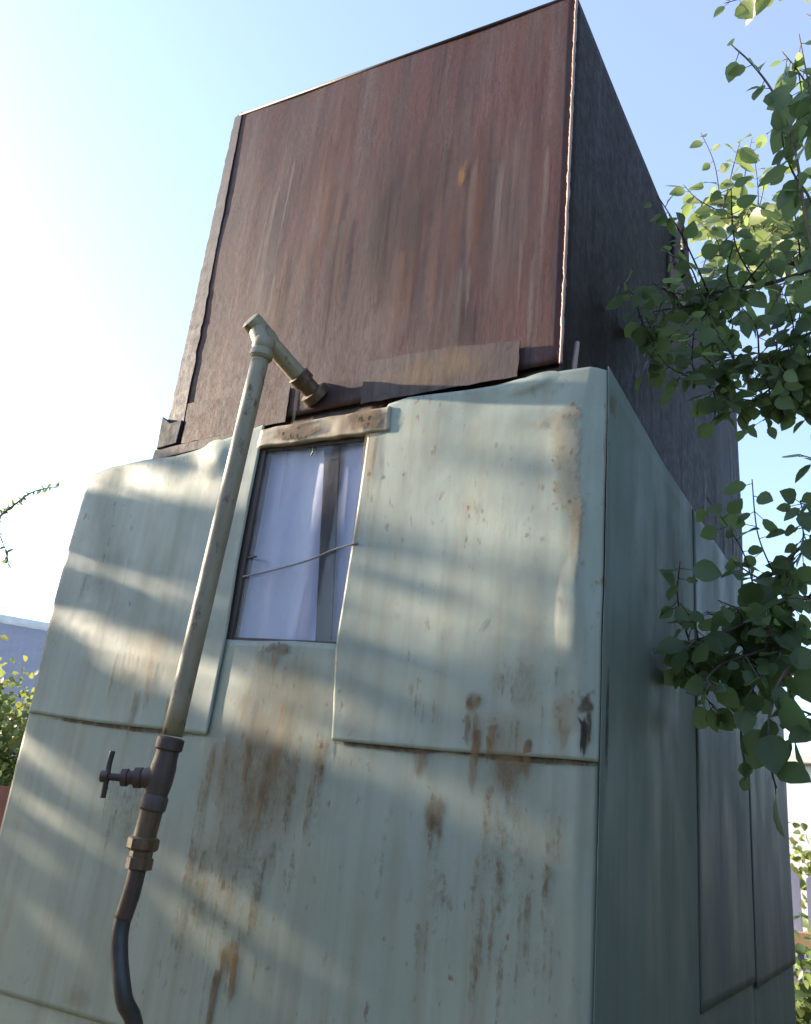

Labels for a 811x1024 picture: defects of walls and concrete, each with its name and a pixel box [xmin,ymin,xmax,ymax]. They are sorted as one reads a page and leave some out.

rust [274,418,320,439]
rust [348,408,381,430]
rust [463,695,589,783]
rust [580,697,593,747]
rust [207,946,237,1024]